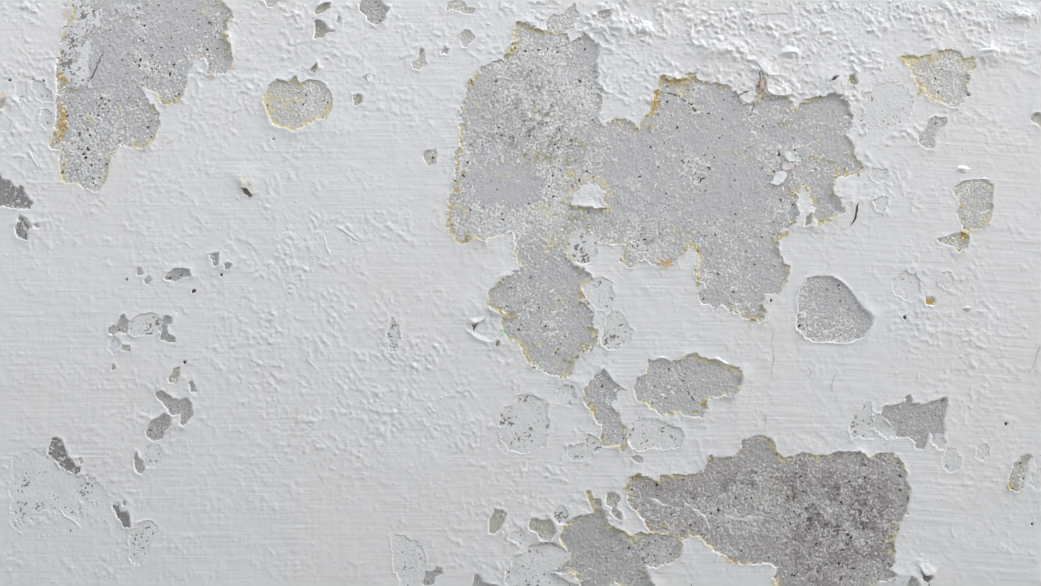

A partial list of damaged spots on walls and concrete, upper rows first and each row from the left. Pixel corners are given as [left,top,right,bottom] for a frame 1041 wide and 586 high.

peeling [33,0,233,192]
peeling [264,58,331,130]
peeling [903,51,973,107]
peeling [0,176,39,240]
peeling [448,4,872,379]
peeling [937,180,993,252]
peeling [160,316,175,342]
peeling [634,354,742,417]
peeling [881,395,947,450]
peeling [529,370,910,586]
peeling [489,510,506,533]
peeling [907,563,938,586]